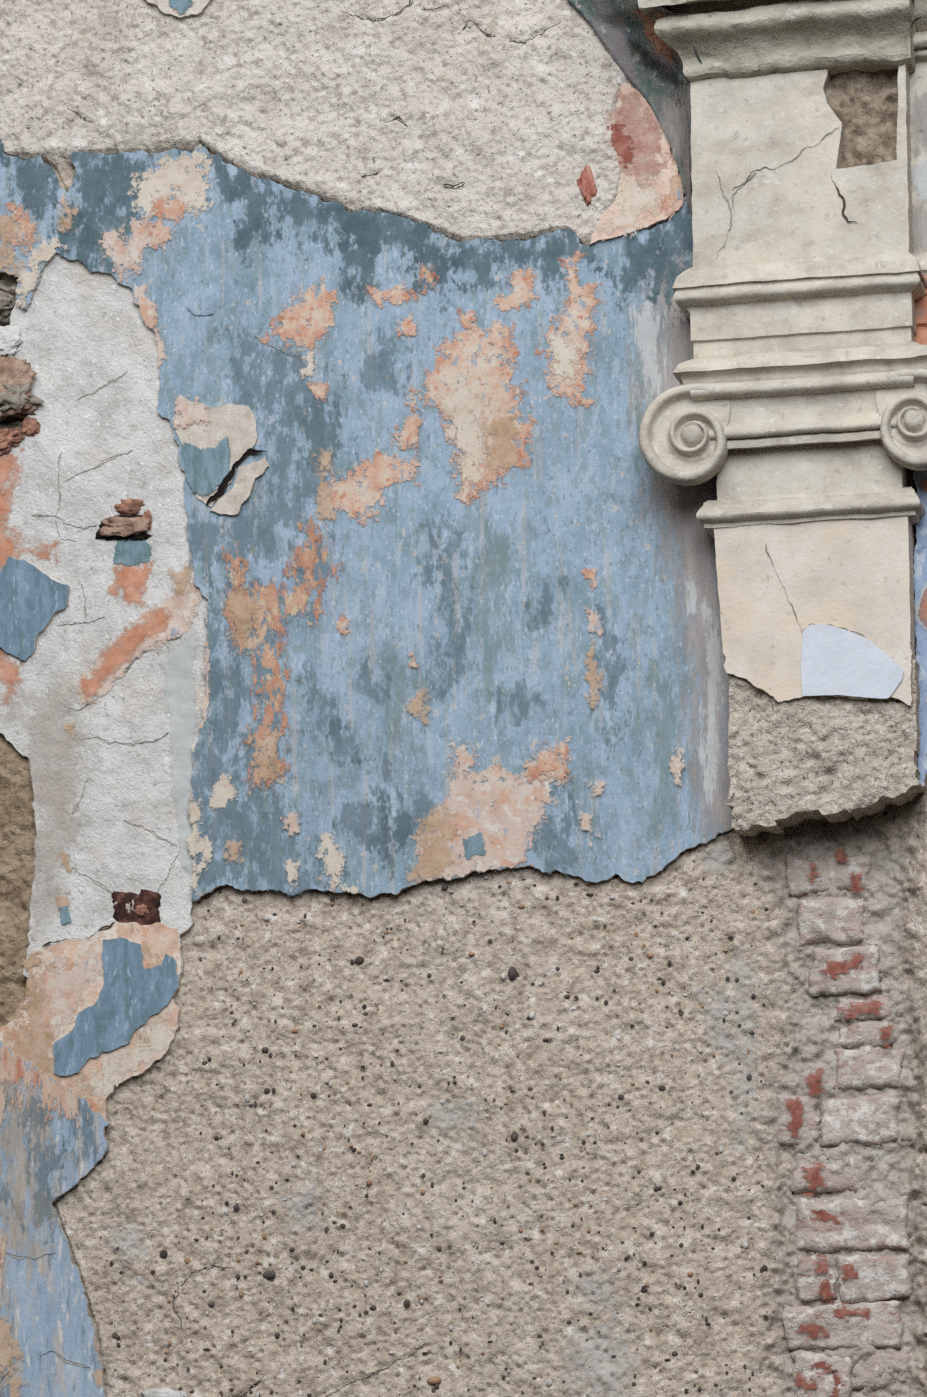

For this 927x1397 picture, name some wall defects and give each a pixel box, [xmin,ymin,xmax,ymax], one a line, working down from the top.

flaking render [147,0,213,19]
flaking render [825,70,898,169]
crack [716,127,839,258]
crack [831,178,857,223]
crack [765,543,891,658]
peeling [801,470,927,791]
flaking render [0,84,732,1397]